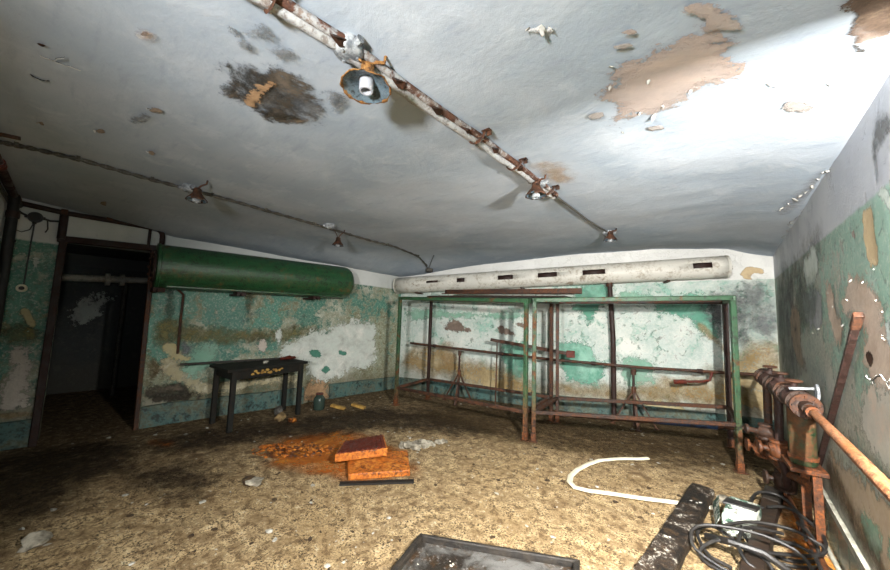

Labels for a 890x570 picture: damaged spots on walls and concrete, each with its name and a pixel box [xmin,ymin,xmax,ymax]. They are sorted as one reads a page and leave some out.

spalling [837,0,890,53]
leakage [221,24,346,124]
peeling [589,2,747,134]
leakage [873,112,890,159]
peeling [732,266,764,280]
spalling [445,319,475,333]
spalling [803,206,890,475]